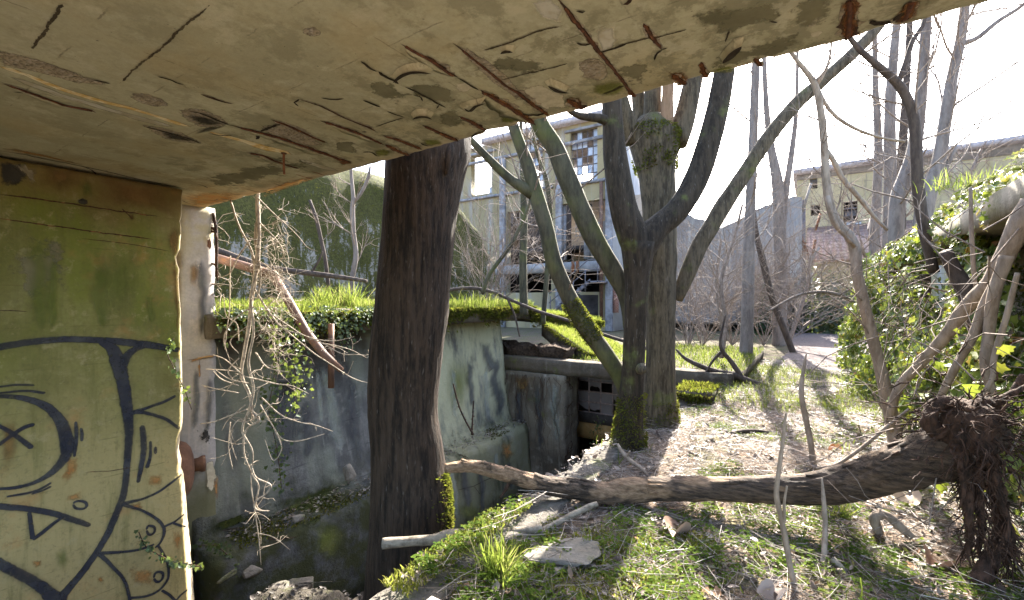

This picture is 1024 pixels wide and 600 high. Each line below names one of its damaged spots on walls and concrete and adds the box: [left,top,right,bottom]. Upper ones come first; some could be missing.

crack [31,5,64,49]
crack [94,5,210,85]
crack [614,29,686,48]
crack [503,63,567,80]
crack [293,61,446,127]
water stain [1,162,26,185]
water stain [484,346,543,446]